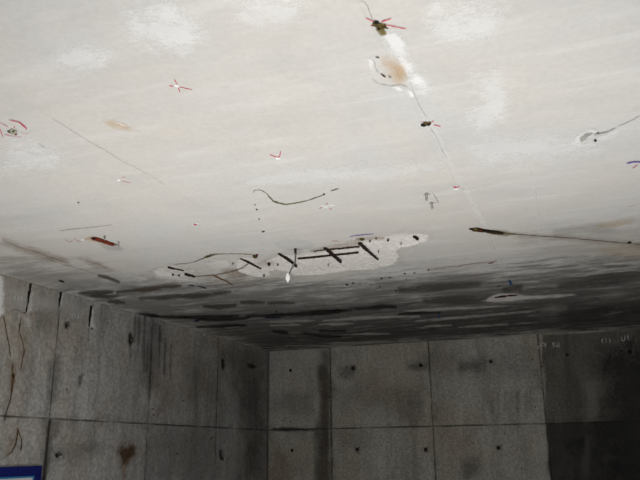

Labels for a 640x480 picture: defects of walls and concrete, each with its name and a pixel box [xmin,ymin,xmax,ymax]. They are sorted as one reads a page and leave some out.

crack [383,32,430,94]
crack [253,189,337,205]
spalling [205,233,429,277]
spalling [153,265,198,282]
damp [399,282,479,291]
damp [562,272,640,287]
damp [80,285,532,345]
corrosion [119,445,135,464]